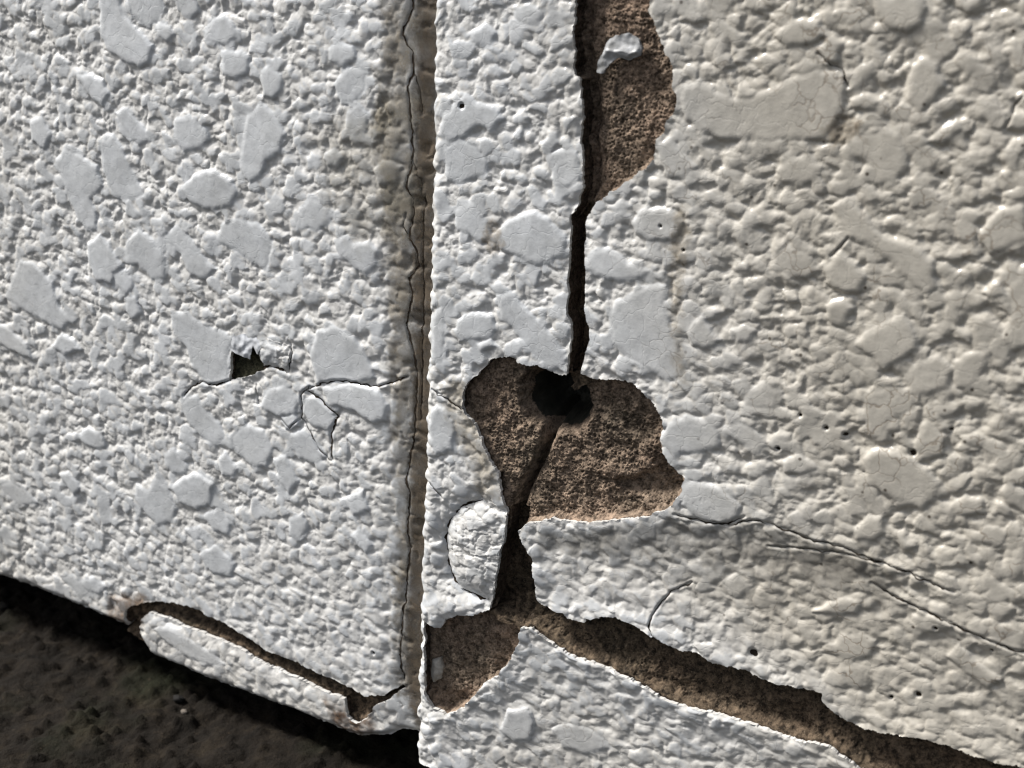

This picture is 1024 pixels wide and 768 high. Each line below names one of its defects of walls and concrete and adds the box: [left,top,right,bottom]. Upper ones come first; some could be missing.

spalling [572,0,677,220]
peeling [230,334,291,379]
crack [126,0,464,722]
spalling [464,356,685,529]
crack [568,201,595,390]
spalling [425,595,520,713]
crack [444,499,1024,768]